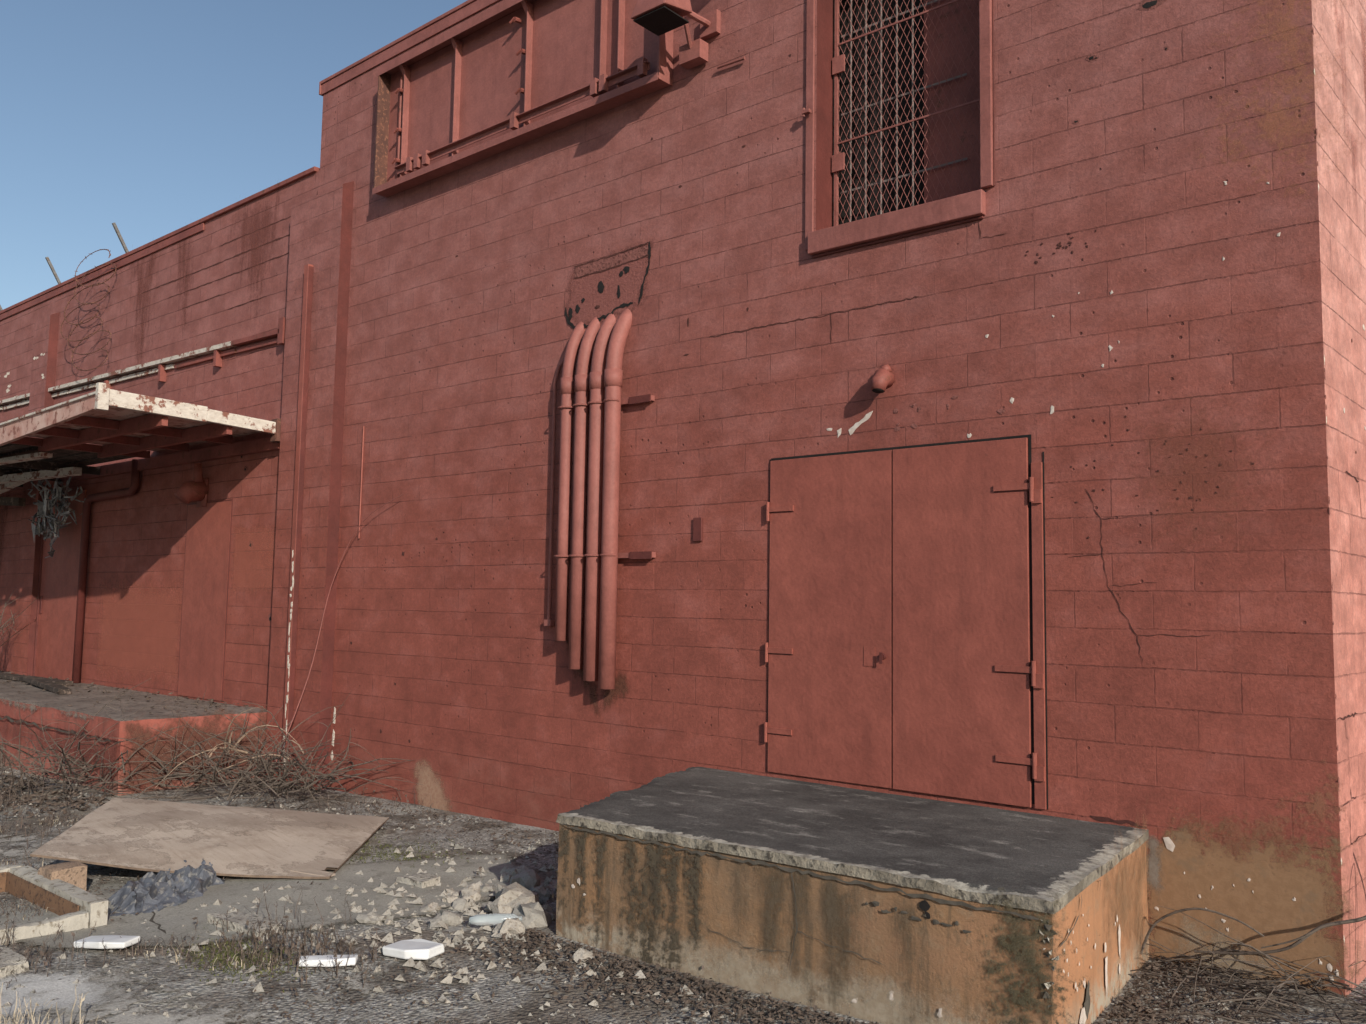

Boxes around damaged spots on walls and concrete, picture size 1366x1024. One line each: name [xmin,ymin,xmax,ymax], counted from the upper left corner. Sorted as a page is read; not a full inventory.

spalling [565,241,652,328]
crack [1068,489,1210,661]
crack [1338,712,1366,845]
water stain [553,815,952,1024]
water stain [1187,930,1264,975]